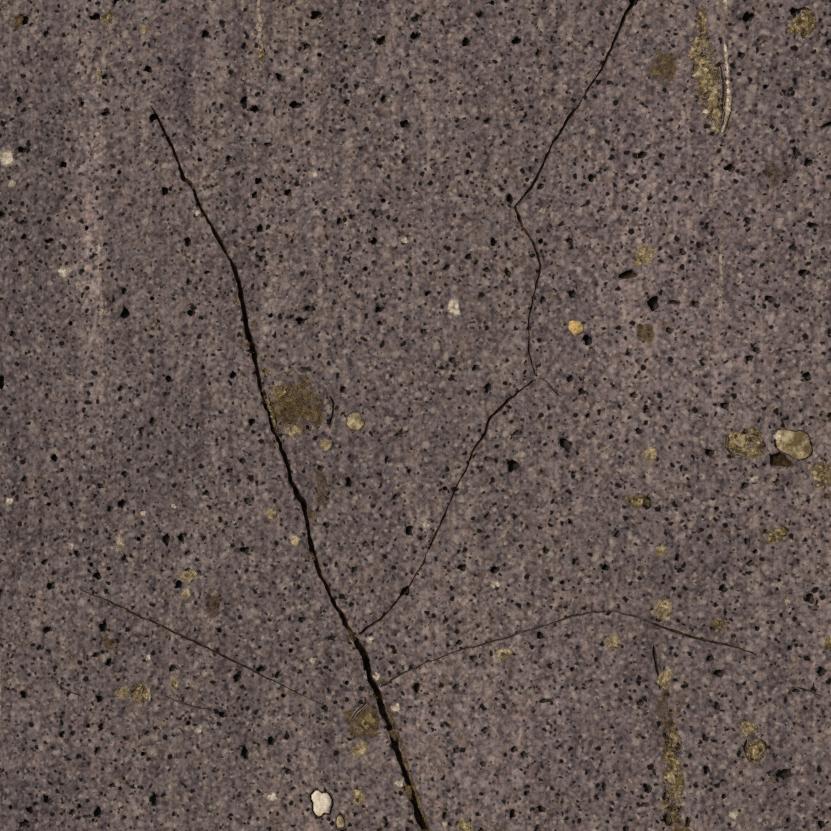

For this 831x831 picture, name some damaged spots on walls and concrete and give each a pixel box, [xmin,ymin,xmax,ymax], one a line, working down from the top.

crack [788,0,831,20]
crack [149,0,760,831]
crack [77,585,332,709]
crack [790,686,825,699]